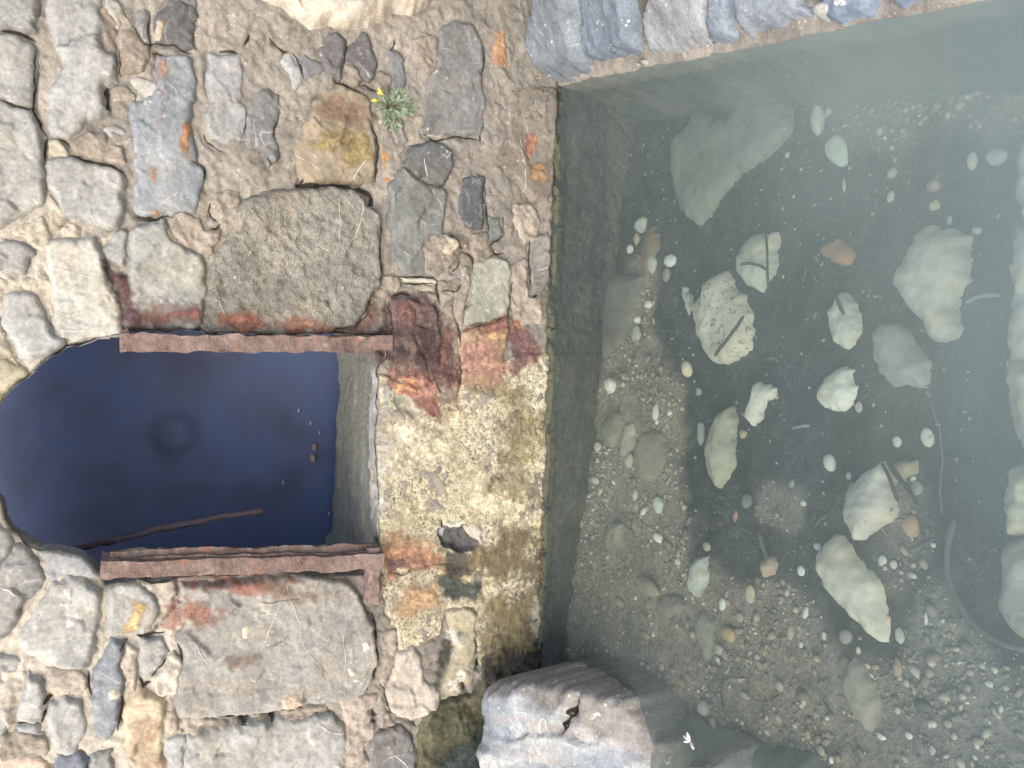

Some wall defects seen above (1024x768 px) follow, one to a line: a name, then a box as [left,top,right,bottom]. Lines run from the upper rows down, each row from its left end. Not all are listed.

corrosion [102,260,203,330]
corrosion [218,292,541,423]
corrosion [144,576,217,638]
corrosion [212,576,315,603]
corrosion [383,531,446,626]